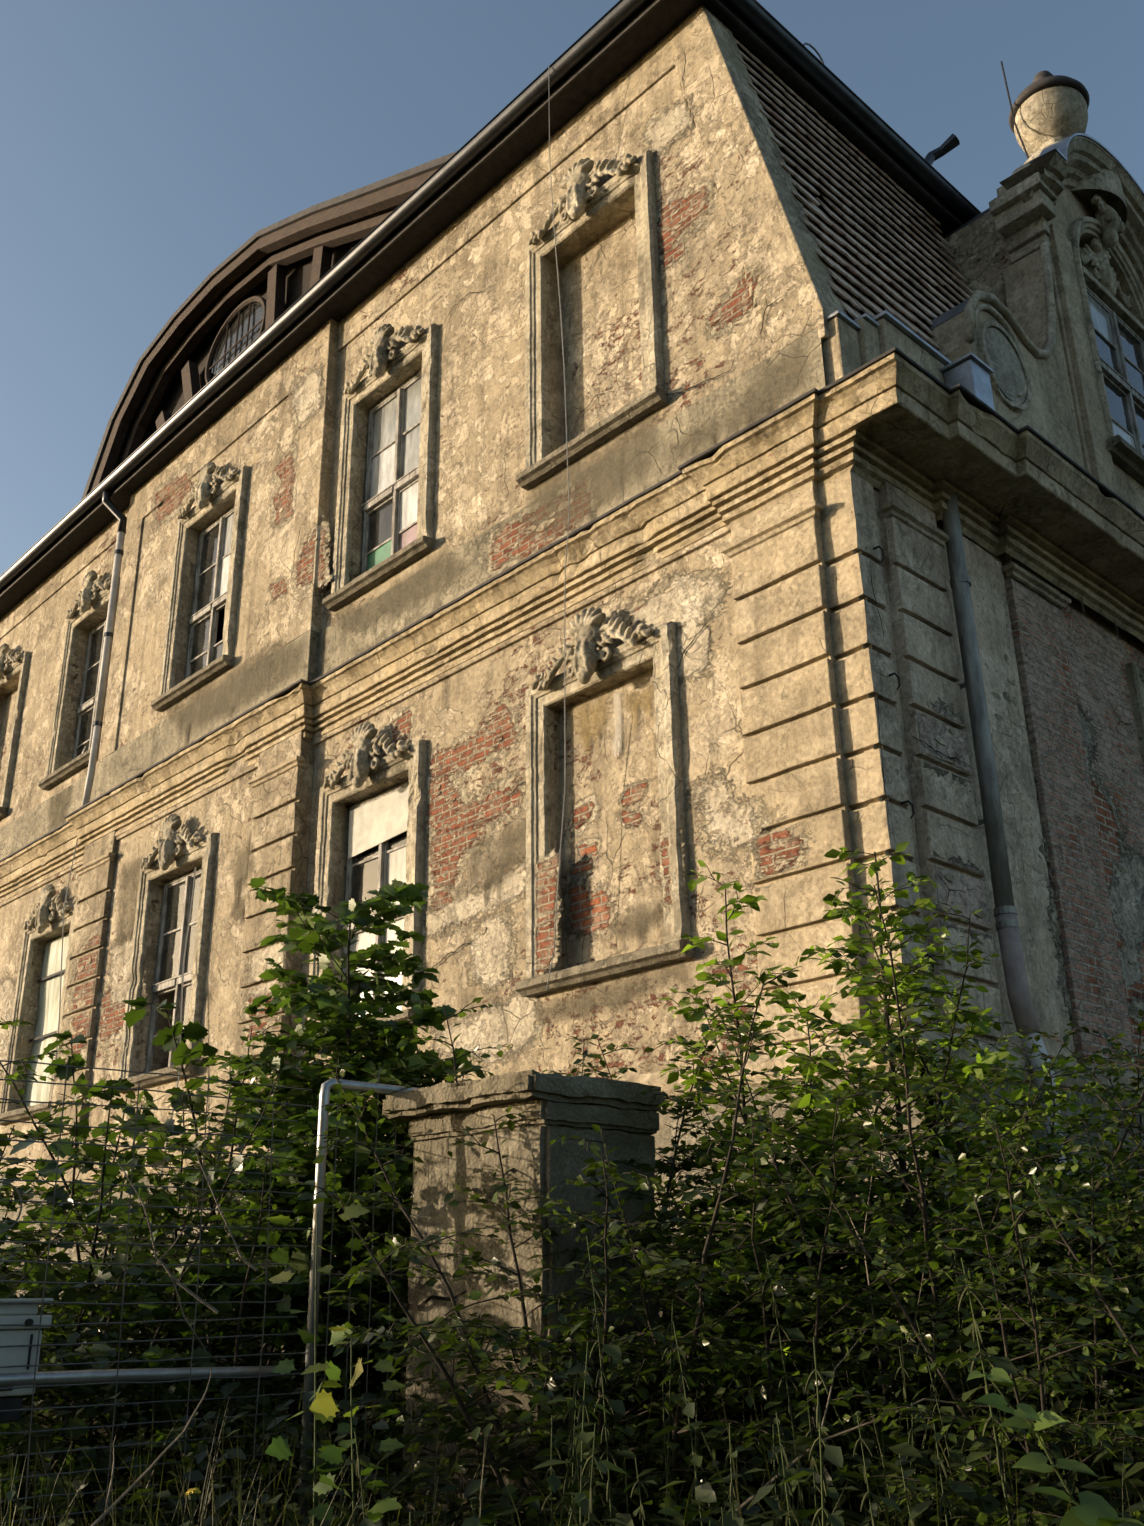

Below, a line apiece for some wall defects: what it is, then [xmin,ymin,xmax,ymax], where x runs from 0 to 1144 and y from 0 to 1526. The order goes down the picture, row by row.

spalling [656,172,719,274]
spalling [267,360,333,605]
spalling [485,467,604,580]
flaking render [991,654,1039,800]
flaking render [423,695,620,1072]
spalling [618,775,650,835]
flaking render [657,762,816,911]
spalling [1037,822,1074,1023]
flaking render [1075,694,1144,1075]